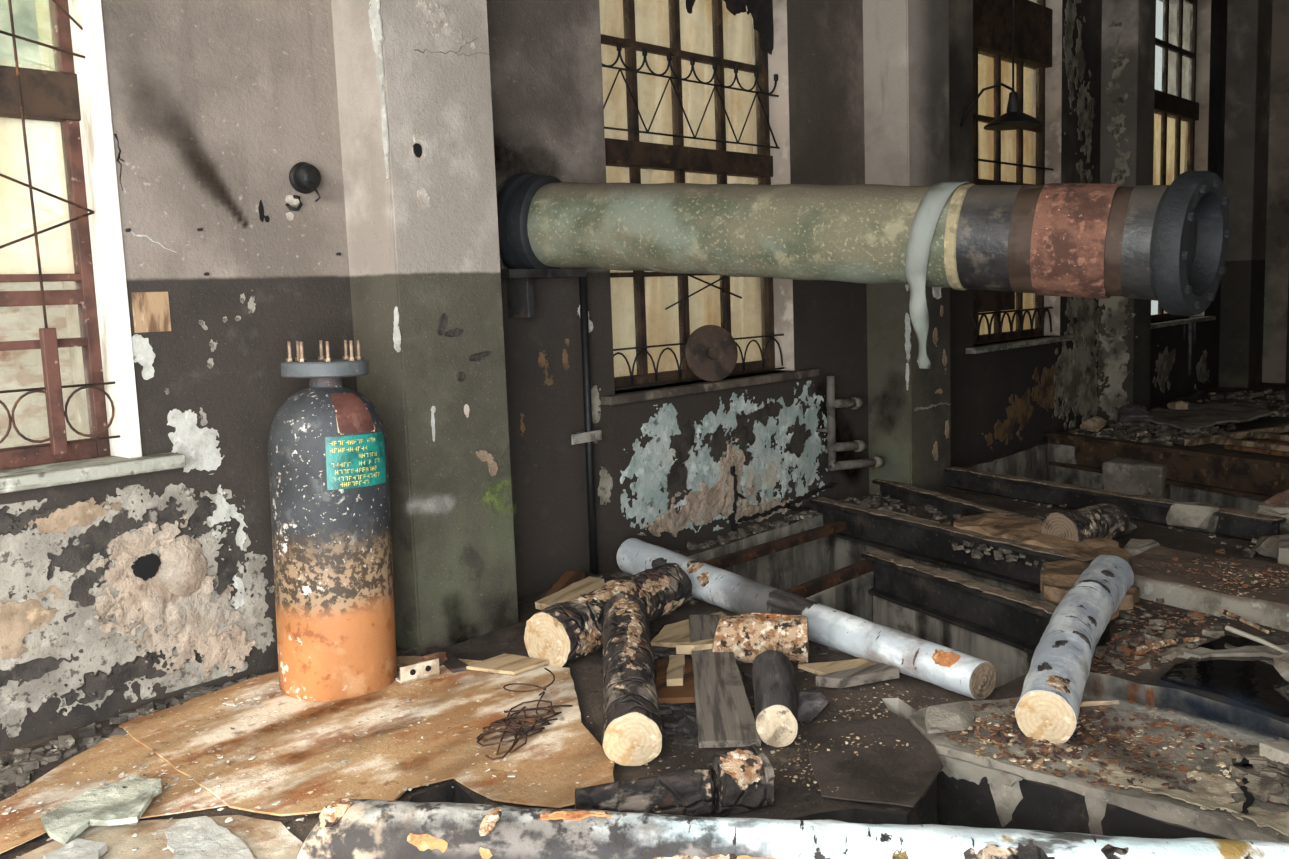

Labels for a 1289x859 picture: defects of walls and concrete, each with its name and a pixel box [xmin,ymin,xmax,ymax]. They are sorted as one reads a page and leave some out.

leakage [177,131,247,227]
rust [1030,183,1122,299]
peeling [131,334,155,380]
peeling [199,320,218,368]
peeling [223,290,256,323]
peeling [591,385,601,423]
peeling [597,380,828,537]
peeling [0,388,275,738]